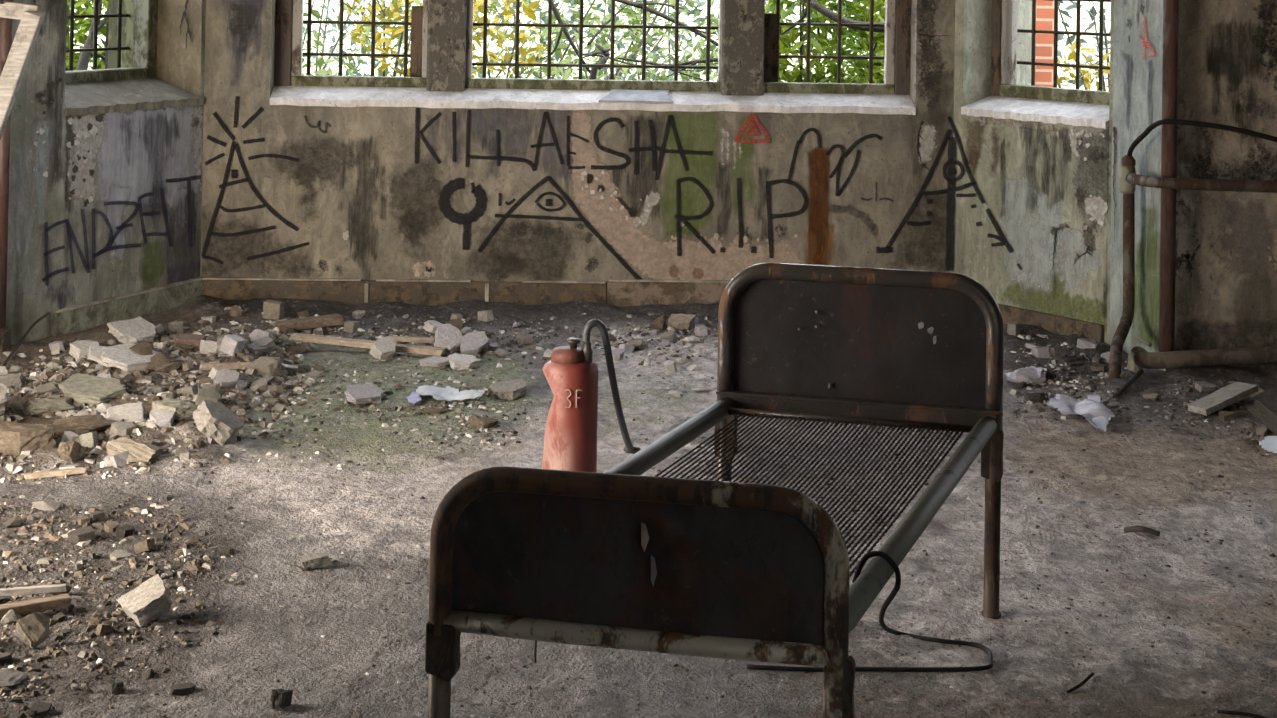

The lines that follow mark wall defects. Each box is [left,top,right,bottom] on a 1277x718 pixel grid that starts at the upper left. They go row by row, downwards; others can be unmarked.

peeling [25,78,63,252]
peeling [64,113,107,211]
damp [227,0,264,78]
damp [613,115,690,239]
peeling [570,110,801,280]
damp [716,119,769,240]
damp [1194,0,1277,181]
damp [1180,201,1277,351]